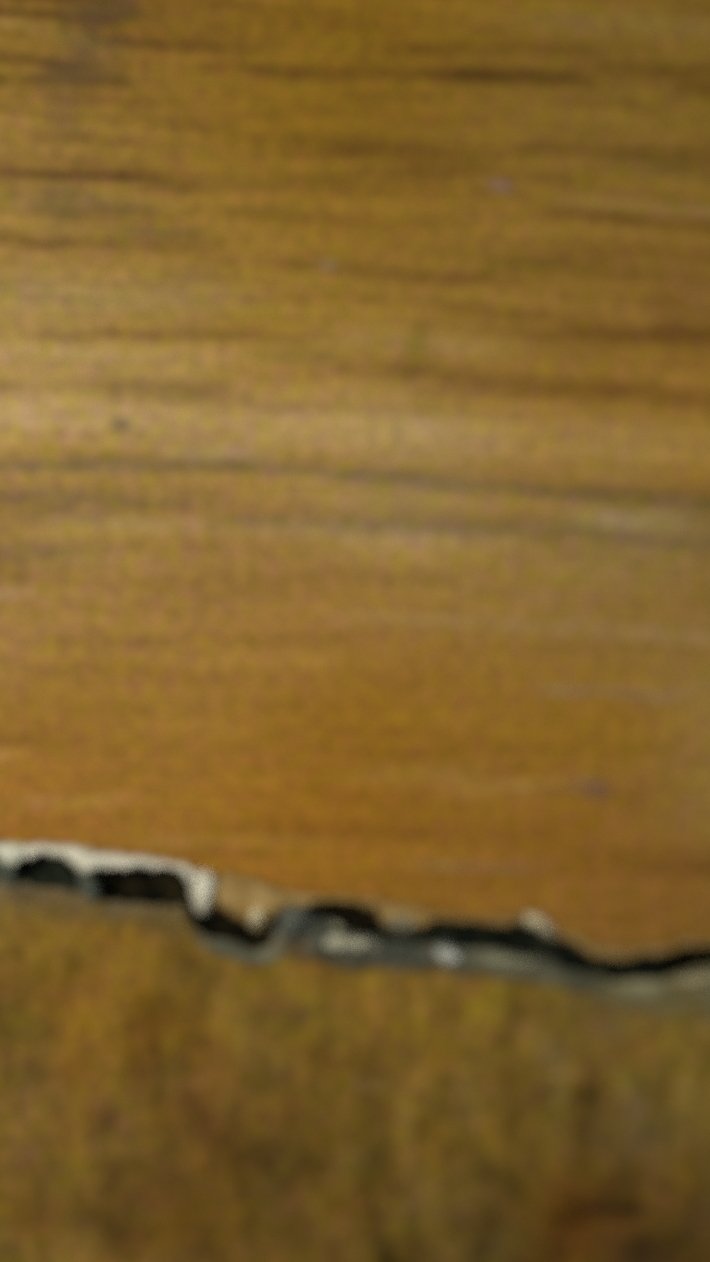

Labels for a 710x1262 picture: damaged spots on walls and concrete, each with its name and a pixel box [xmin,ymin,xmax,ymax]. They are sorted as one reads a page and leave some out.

crack [16,852,276,951]
crack [312,901,710,982]